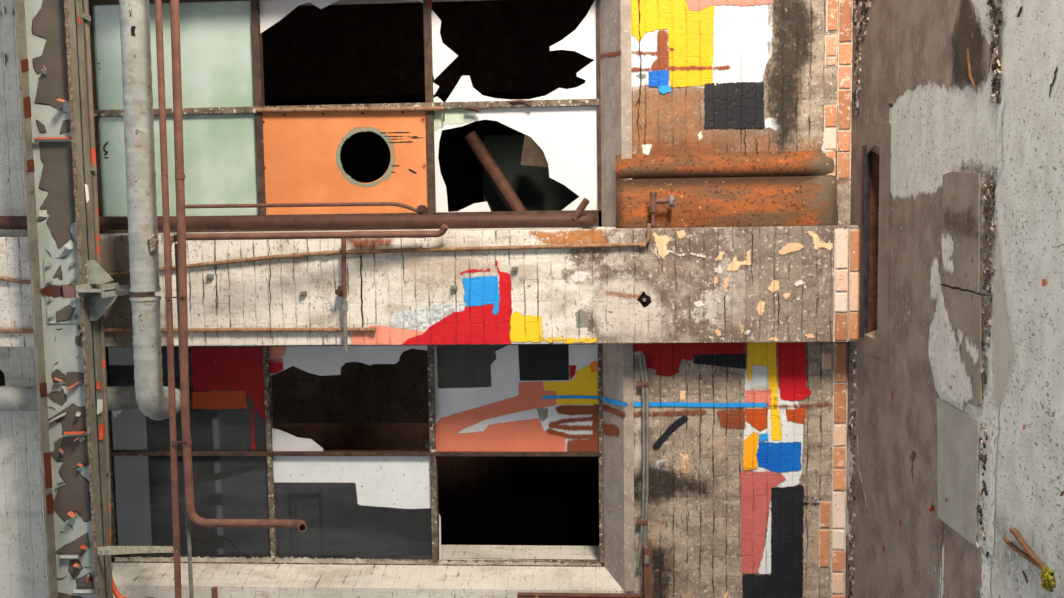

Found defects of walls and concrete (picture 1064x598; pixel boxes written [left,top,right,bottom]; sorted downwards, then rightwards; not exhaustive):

peeling [21,0,90,250]
peeling [56,305,82,347]
peeling [653,229,751,303]
peeling [756,279,805,316]
peeling [778,0,991,598]